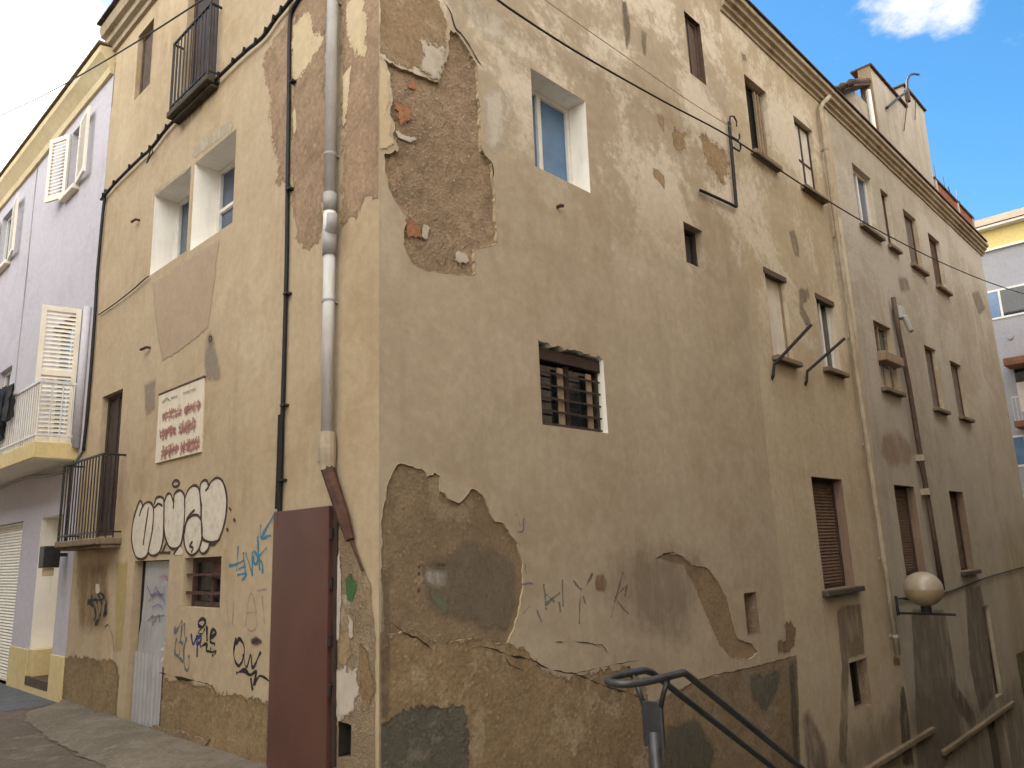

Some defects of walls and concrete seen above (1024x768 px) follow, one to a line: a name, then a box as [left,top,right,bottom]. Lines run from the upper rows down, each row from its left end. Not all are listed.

peeling [262,0,327,250]
spalling [339,0,498,276]
flaking render [62,653,120,716]
flaking render [152,678,268,764]
crack [392,622,432,650]
flaking render [335,462,649,768]
crack [473,641,638,697]
spalling [655,552,758,660]
peeling [778,621,796,653]
water stain [900,587,994,768]